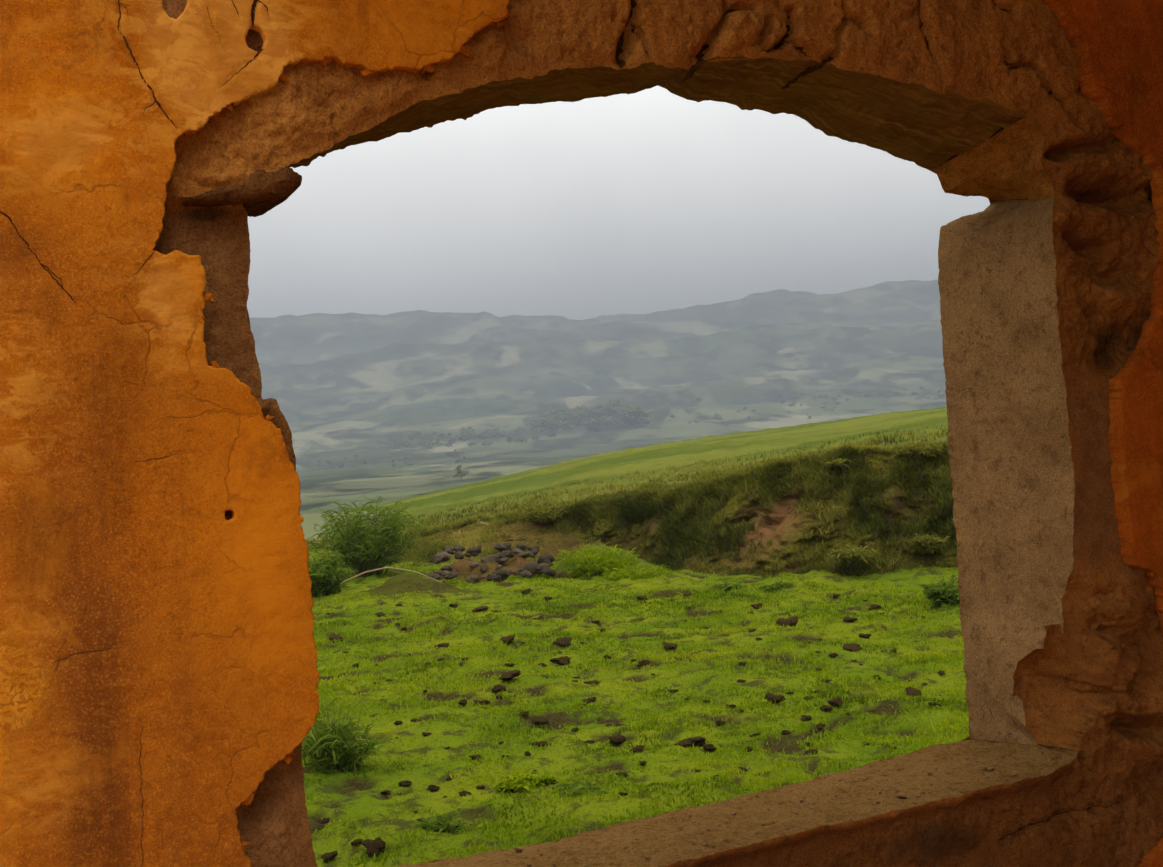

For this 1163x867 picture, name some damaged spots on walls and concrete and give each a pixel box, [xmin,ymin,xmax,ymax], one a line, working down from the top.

crack [118,0,175,126]
crack [207,0,270,87]
crack [616,0,649,68]
crack [0,211,76,303]
spalling [152,0,1099,471]
spalling [664,109,1163,867]
spalling [235,743,317,867]